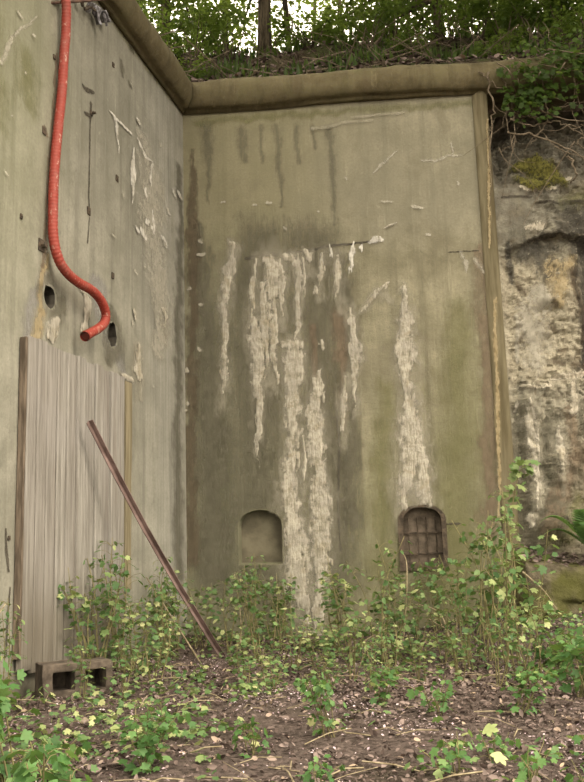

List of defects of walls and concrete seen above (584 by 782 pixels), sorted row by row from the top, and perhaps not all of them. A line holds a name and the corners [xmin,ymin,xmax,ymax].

water stain [109,110,397,638]
water stain [394,282,432,511]